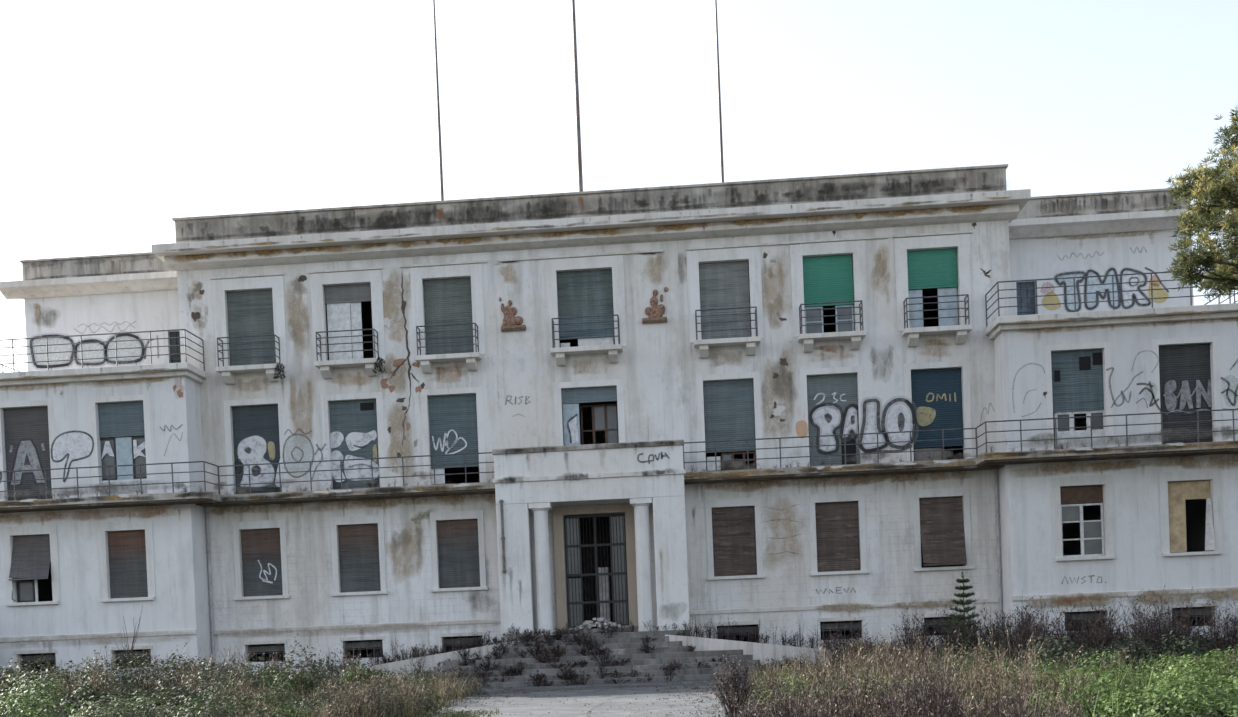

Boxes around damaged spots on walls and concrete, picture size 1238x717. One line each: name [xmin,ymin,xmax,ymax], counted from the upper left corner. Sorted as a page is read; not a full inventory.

water stain [176,208,429,261]
water stain [439,196,648,243]
water stain [658,195,708,231]
water stain [728,191,782,225]
crack [390,276,419,446]
peeling [381,358,425,468]